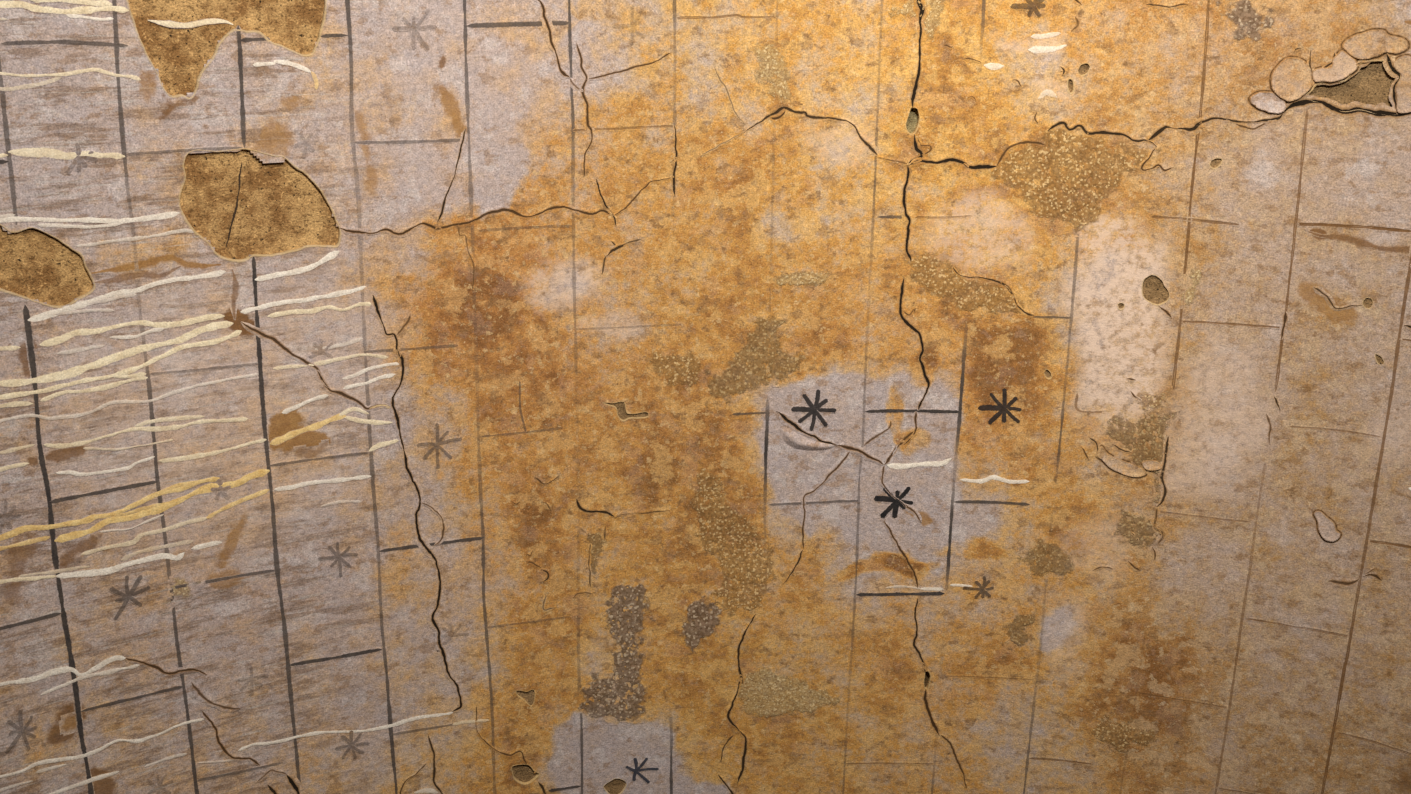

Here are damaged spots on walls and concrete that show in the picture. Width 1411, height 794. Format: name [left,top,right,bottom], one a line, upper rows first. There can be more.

spalling [126,0,328,100]
water stain [778,0,1407,163]
spalling [1247,27,1411,115]
spalling [0,223,96,309]
spalling [178,147,342,263]
efflorescence [0,269,258,423]
water stain [0,468,371,585]
crack [241,295,551,794]
water stain [238,0,874,794]
crack [339,0,1411,794]
water stain [626,106,1411,794]
crack [125,656,302,794]